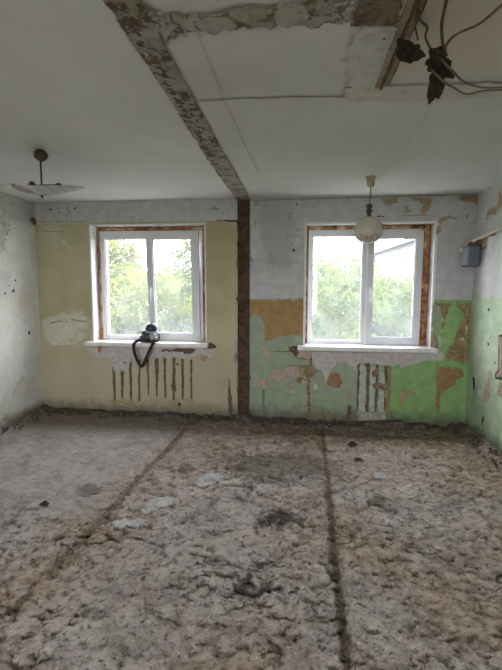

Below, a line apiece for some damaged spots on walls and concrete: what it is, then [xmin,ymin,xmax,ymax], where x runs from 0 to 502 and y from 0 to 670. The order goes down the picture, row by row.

peeling [111,5,215,164]
peeling [403,195,432,215]
peeling [457,195,478,206]
peeling [41,308,91,349]
flaking render [234,199,482,421]
peeling [87,342,217,373]
flaking render [477,336,502,403]